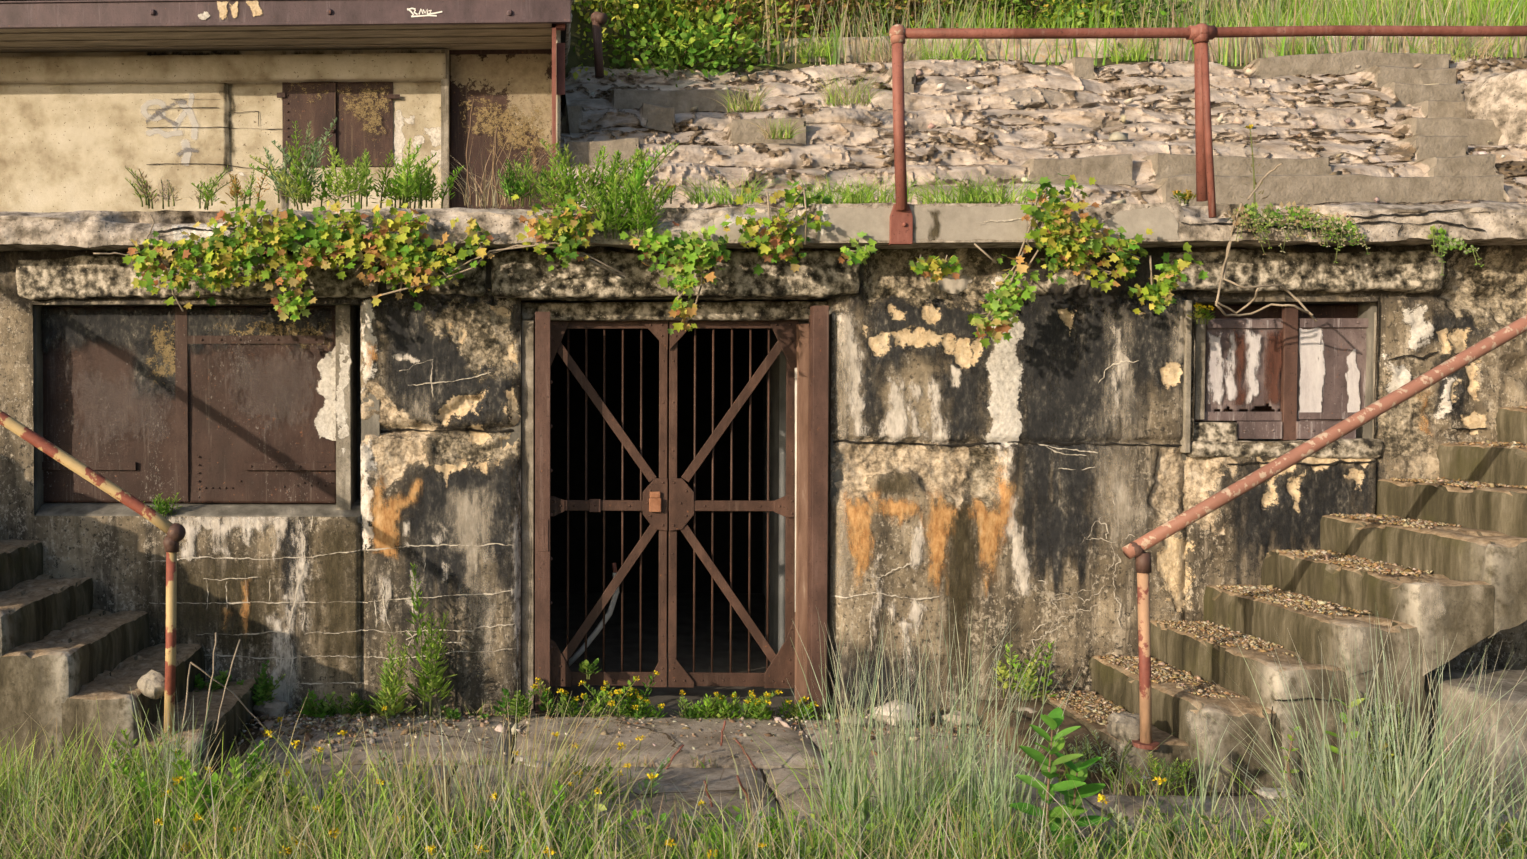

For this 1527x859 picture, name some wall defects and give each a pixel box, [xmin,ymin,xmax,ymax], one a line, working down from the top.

peeling [171,222,231,242]
spalling [815,204,1027,369]
leakage [146,457,521,714]
rust [371,477,420,556]
spalling [314,289,521,678]
rust [846,468,1013,593]
leakage [832,277,1195,600]
leakage [1222,457,1379,584]
spalling [1149,245,1527,540]
leakage [1188,711,1207,735]